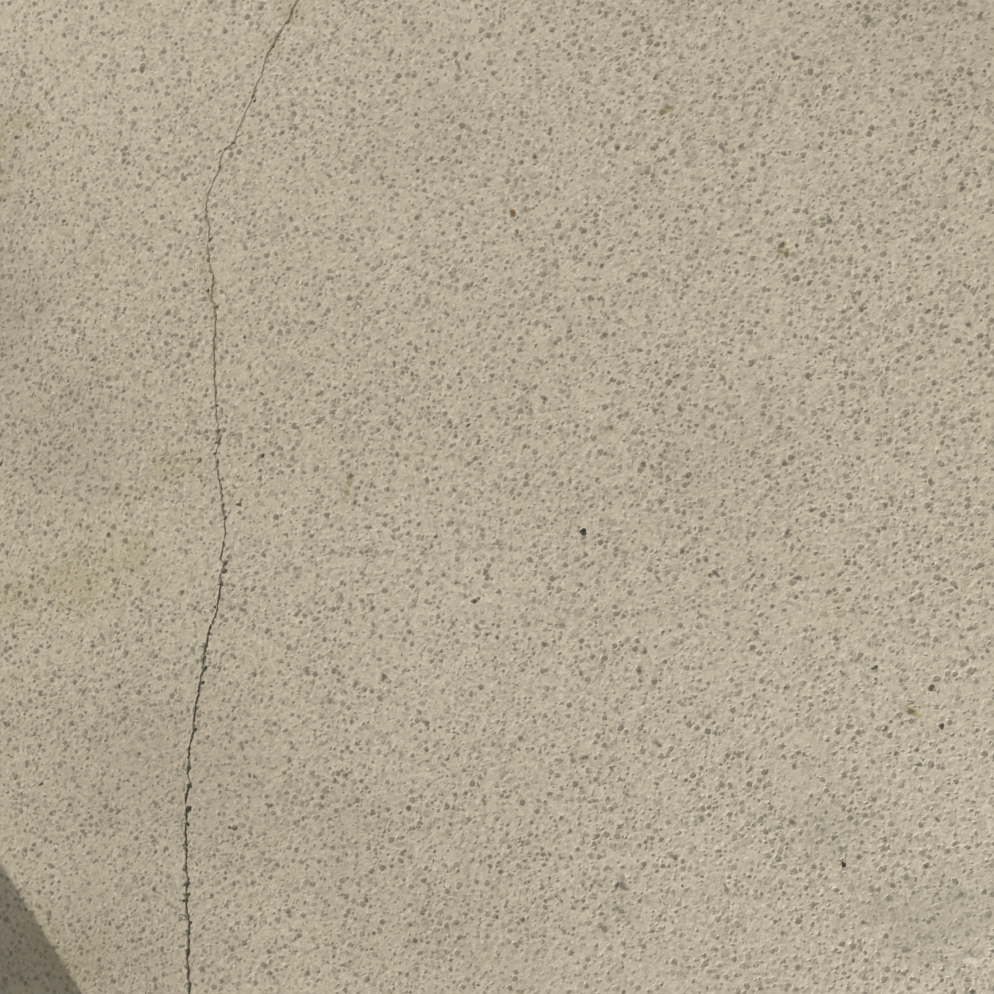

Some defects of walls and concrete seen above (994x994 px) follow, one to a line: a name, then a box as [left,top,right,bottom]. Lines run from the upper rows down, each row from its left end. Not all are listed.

crack [177,0,298,994]